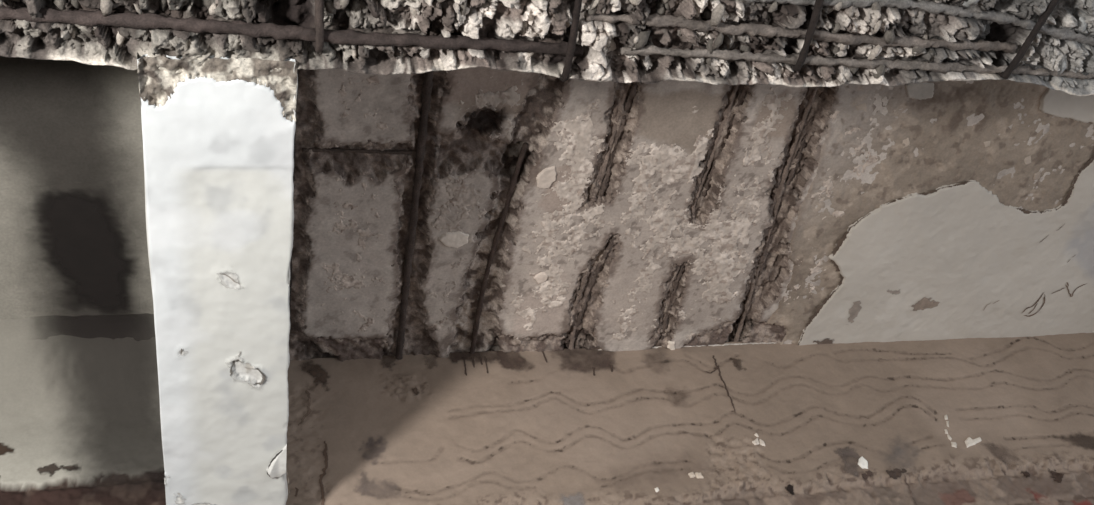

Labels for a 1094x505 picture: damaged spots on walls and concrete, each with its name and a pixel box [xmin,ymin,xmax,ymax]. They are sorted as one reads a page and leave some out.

spalling [0,0,1094,362]
crack [705,355,735,412]
peeling [37,464,79,476]